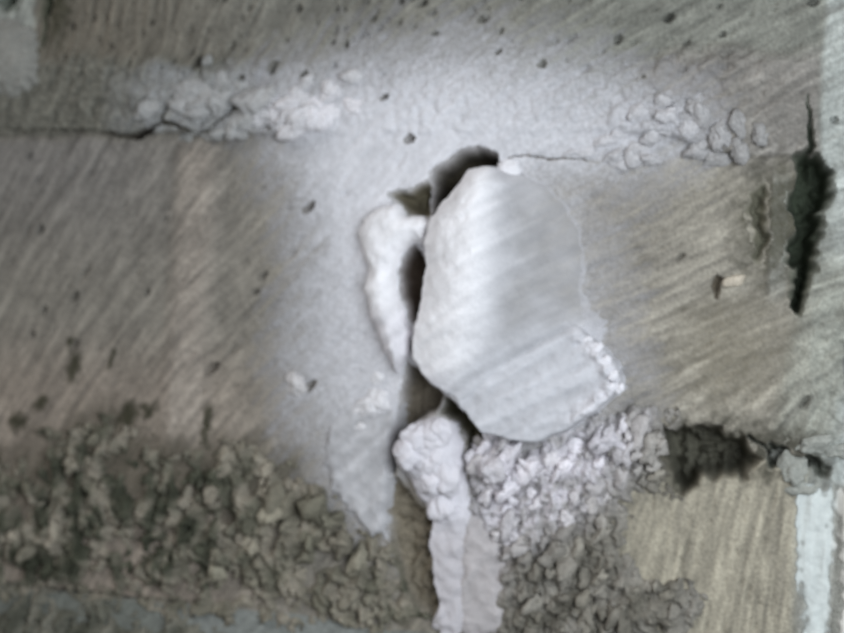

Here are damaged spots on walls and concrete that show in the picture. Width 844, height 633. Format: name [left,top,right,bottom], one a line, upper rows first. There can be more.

spalling [0,0,23,14]
spalling [37,0,56,53]
crack [0,94,239,141]
water stain [259,37,691,633]
spalling [0,412,440,633]
spalling [458,322,844,633]